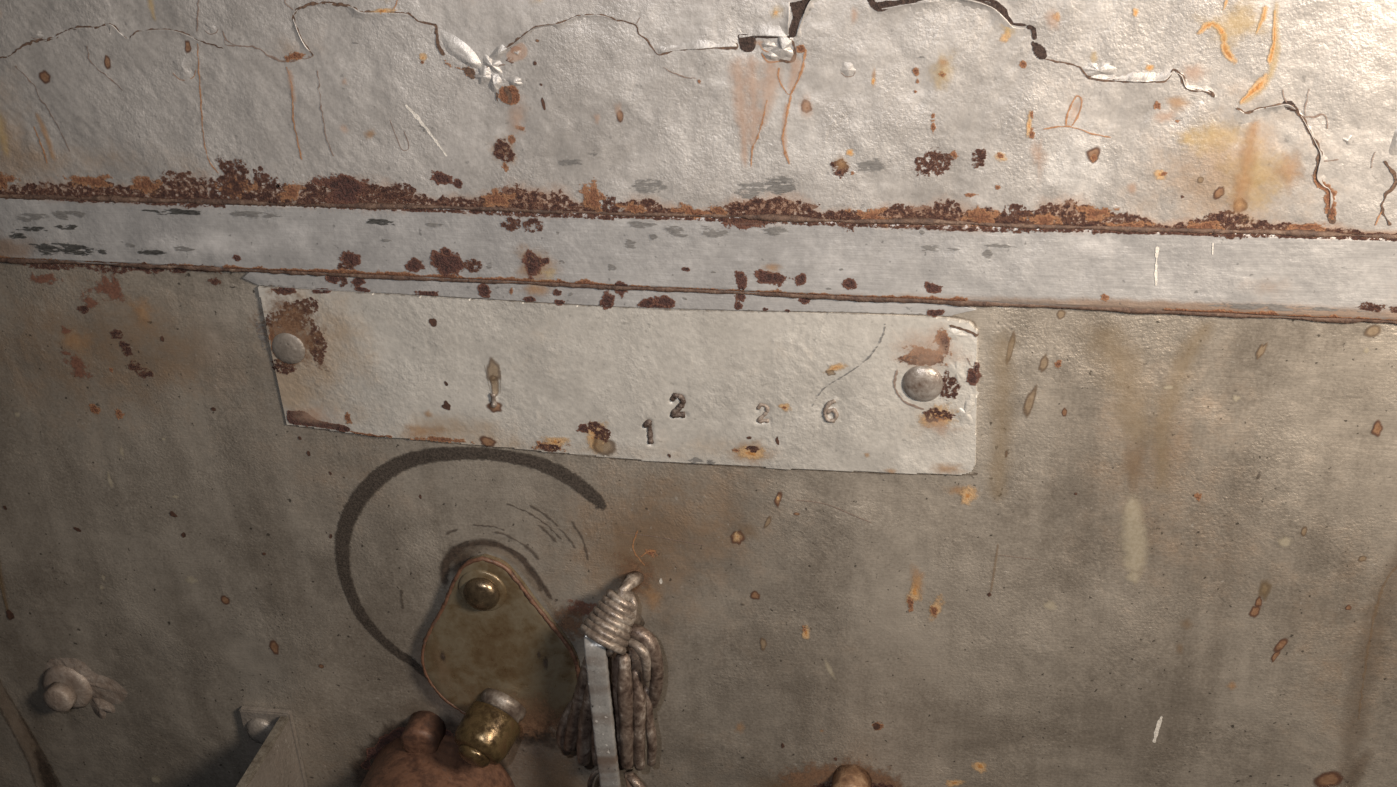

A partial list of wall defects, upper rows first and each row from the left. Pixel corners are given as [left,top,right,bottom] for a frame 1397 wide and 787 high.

corrosion [39,71,50,83]
crack [0,0,438,173]
crack [505,0,819,84]
corrosion [914,113,1006,177]
corrosion [1026,111,1035,139]
crack [867,0,1339,224]
corrosion [1198,0,1237,62]
corrosion [1240,6,1277,104]
crack [1371,128,1397,226]
corrosion [0,125,1397,427]
corrosion [1372,420,1383,436]
corrosion [1314,771,1343,787]